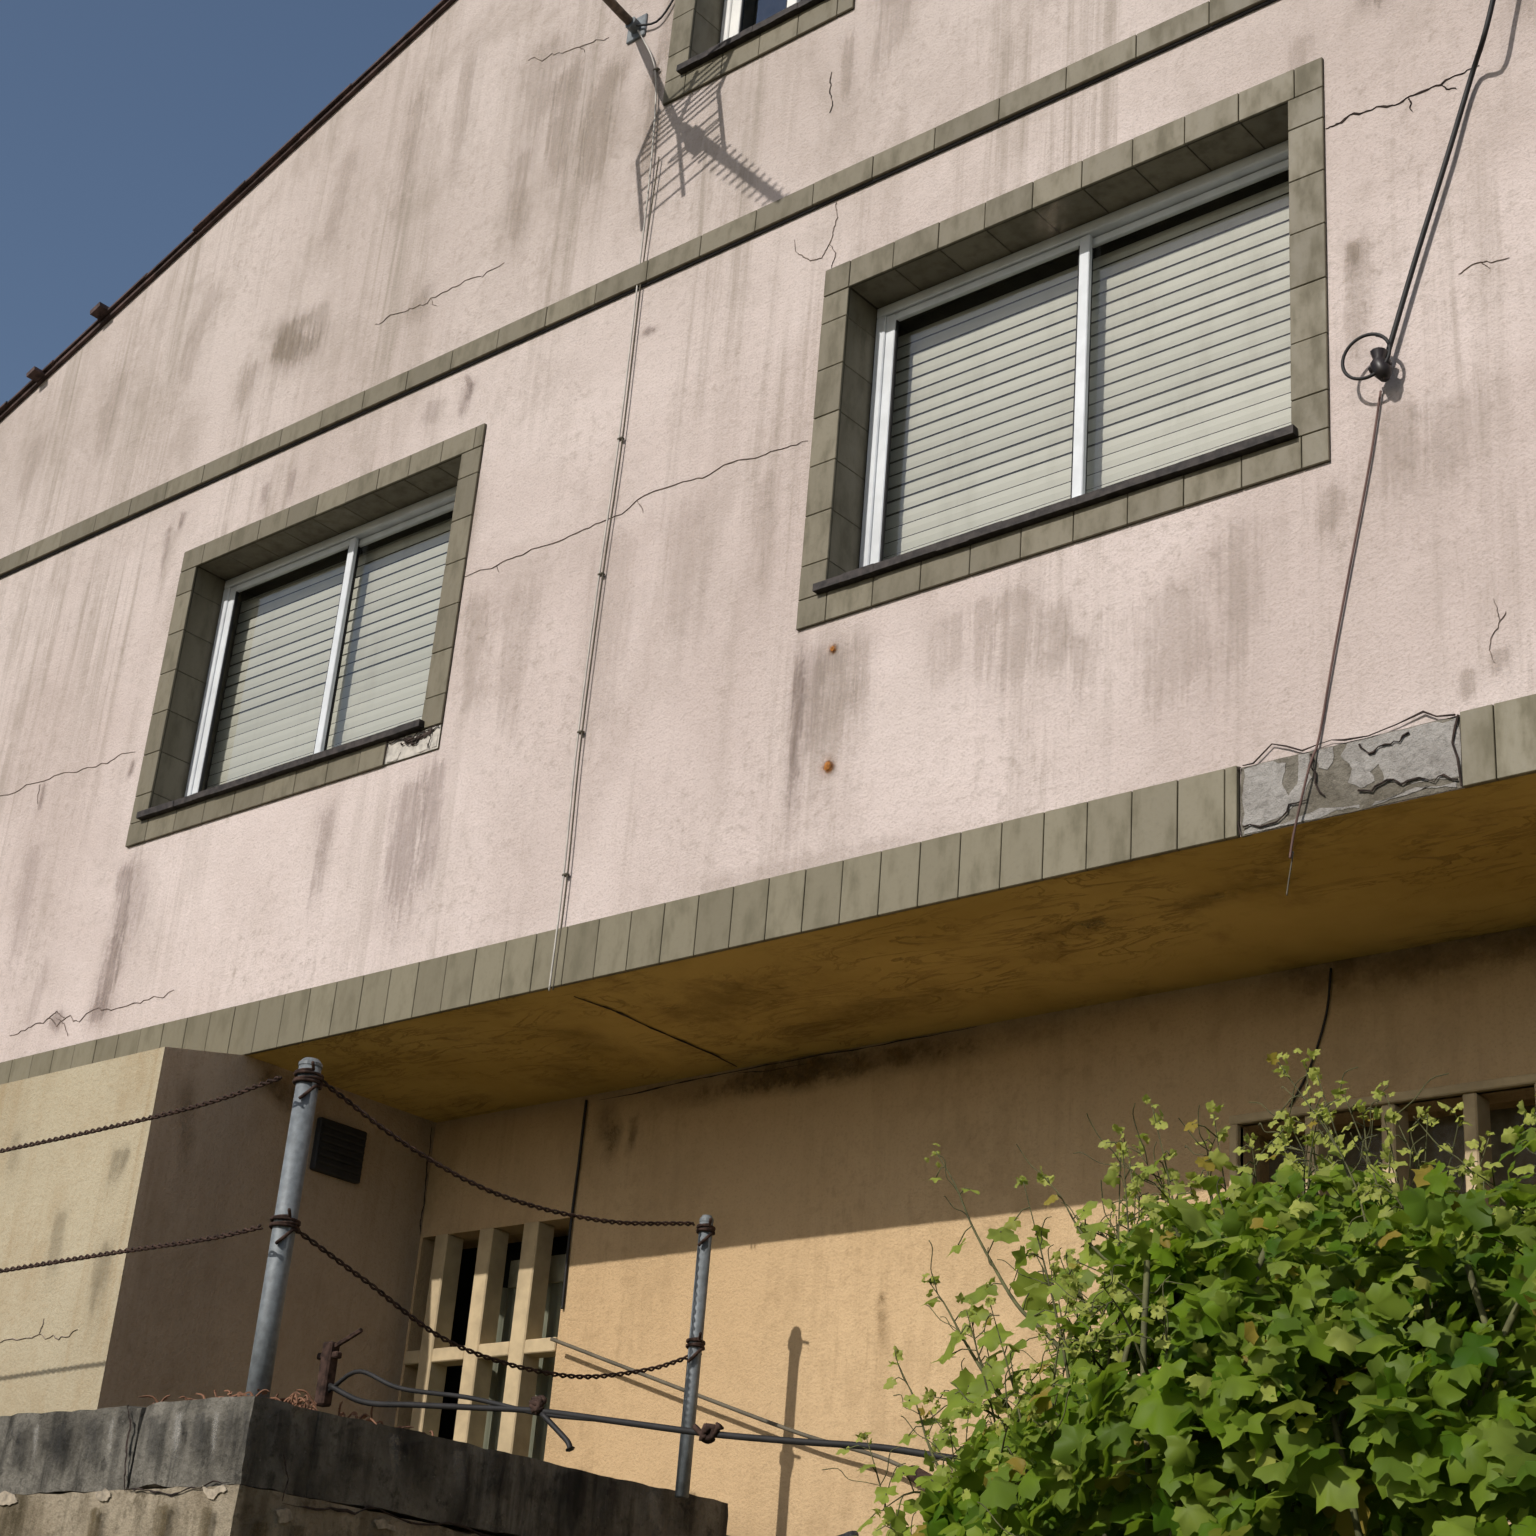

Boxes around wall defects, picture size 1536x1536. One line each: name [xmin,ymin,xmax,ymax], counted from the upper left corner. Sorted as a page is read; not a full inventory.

crack [1325,65,1479,129]
crack [375,263,503,325]
crack [464,441,804,577]
crack [0,752,130,804]
peeling [1237,710,1464,838]
crack [10,990,173,1036]